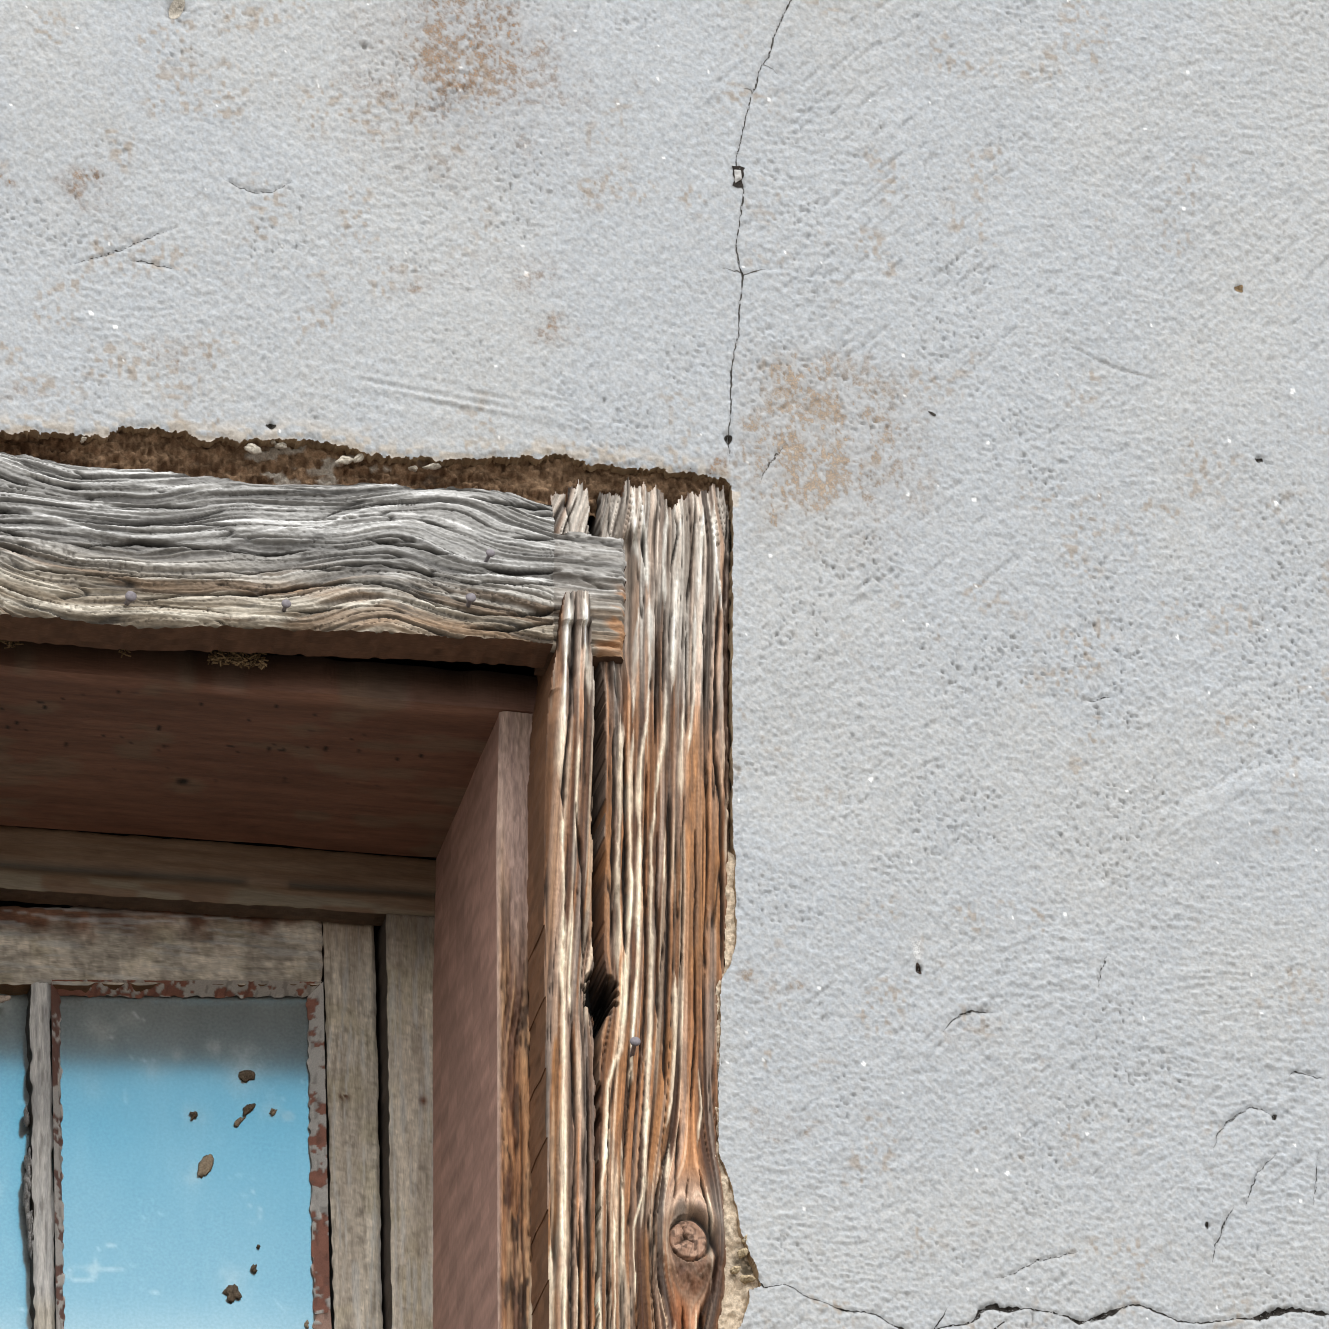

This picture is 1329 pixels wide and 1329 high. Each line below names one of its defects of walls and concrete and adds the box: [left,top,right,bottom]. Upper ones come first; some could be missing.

crack [721,0,792,454]
flaking render [0,424,732,573]
flaking render [715,810,736,1073]
flaking render [715,1107,758,1329]
crack [758,1251,1329,1329]